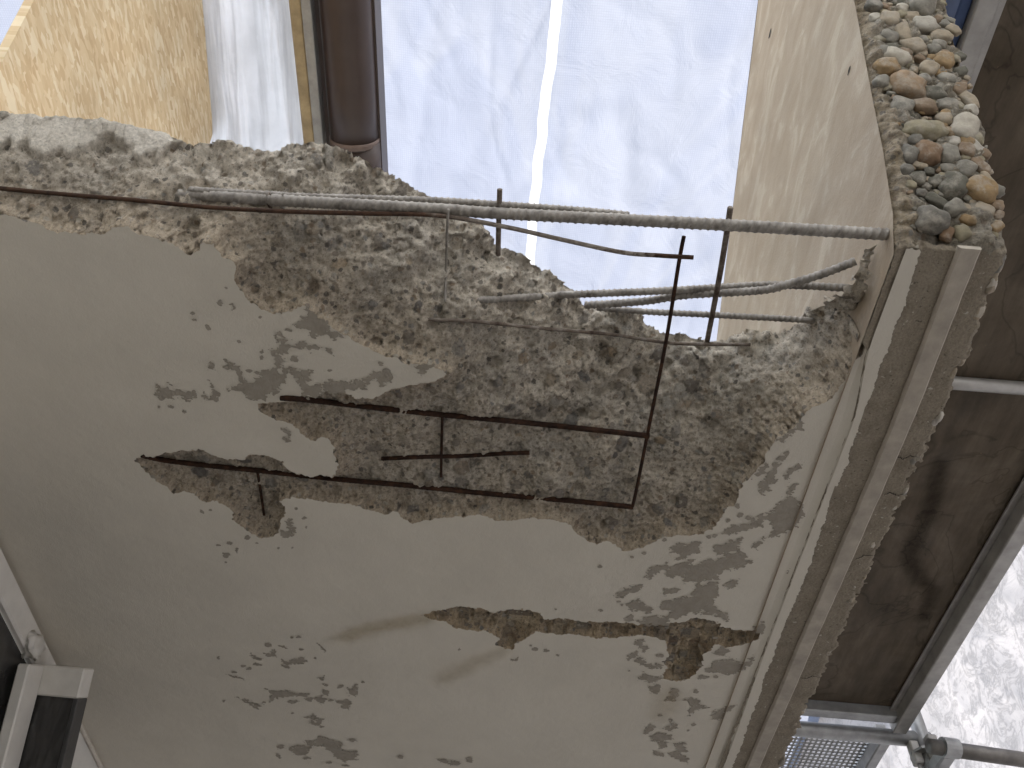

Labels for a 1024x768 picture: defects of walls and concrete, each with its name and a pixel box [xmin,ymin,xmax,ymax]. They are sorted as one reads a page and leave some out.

spalling [854,0,1006,254]
spalling [0,111,890,694]
peeling [222,675,365,766]
peeling [643,714,690,763]
peeling [664,688,735,731]